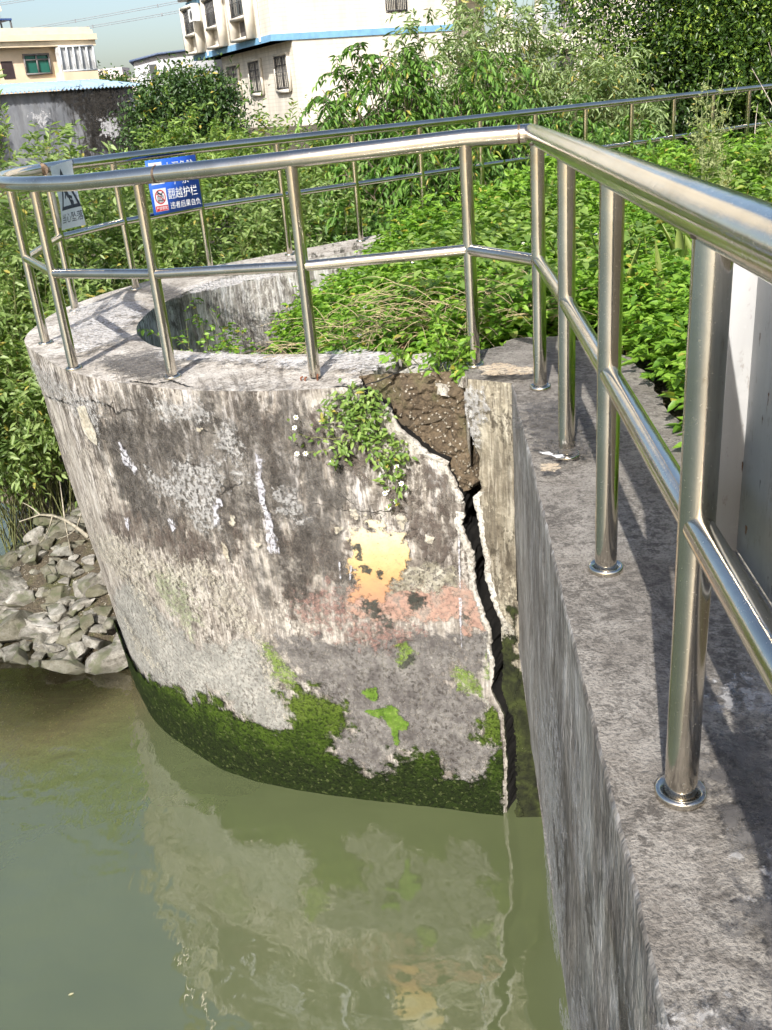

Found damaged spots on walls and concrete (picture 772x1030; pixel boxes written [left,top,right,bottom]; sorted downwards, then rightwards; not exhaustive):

leakage [79,366,501,782]
crack [312,495,415,522]
crack [332,367,518,811]